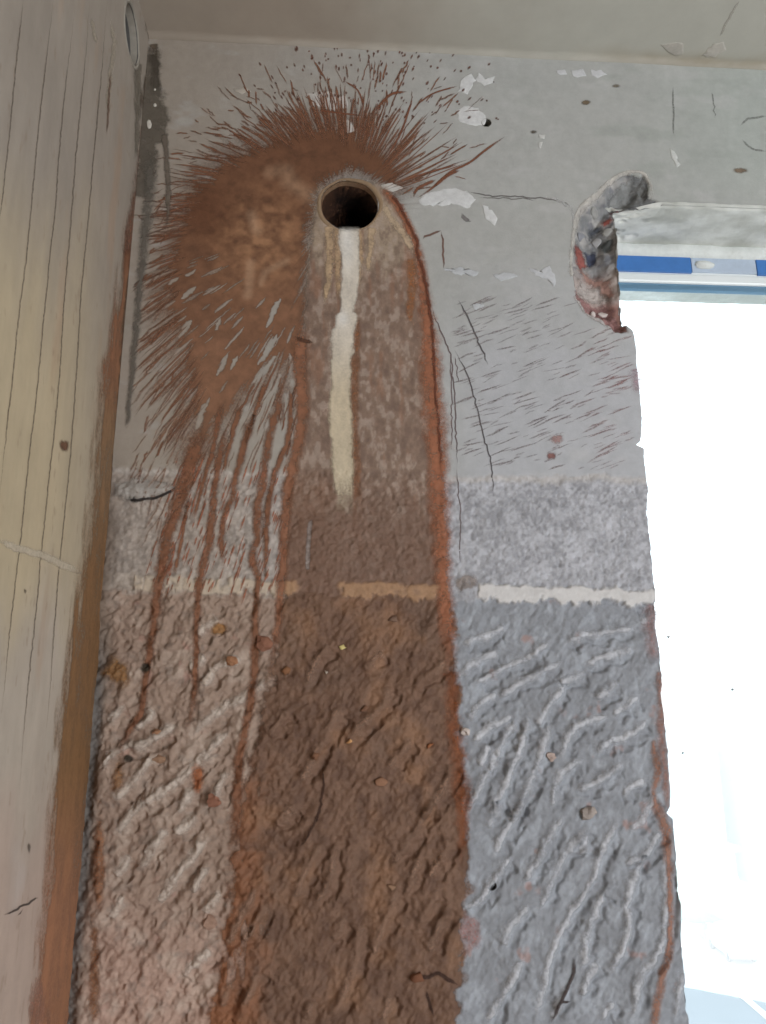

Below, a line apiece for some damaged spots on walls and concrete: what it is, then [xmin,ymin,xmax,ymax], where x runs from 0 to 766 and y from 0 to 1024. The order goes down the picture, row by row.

peeling [456,72,495,126]
crack [439,234,447,266]
peeling [418,188,498,226]
spalling [569,170,655,333]
water stain [324,226,376,500]
crack [435,319,459,450]
rust [29,46,500,1024]
crack [455,479,463,558]